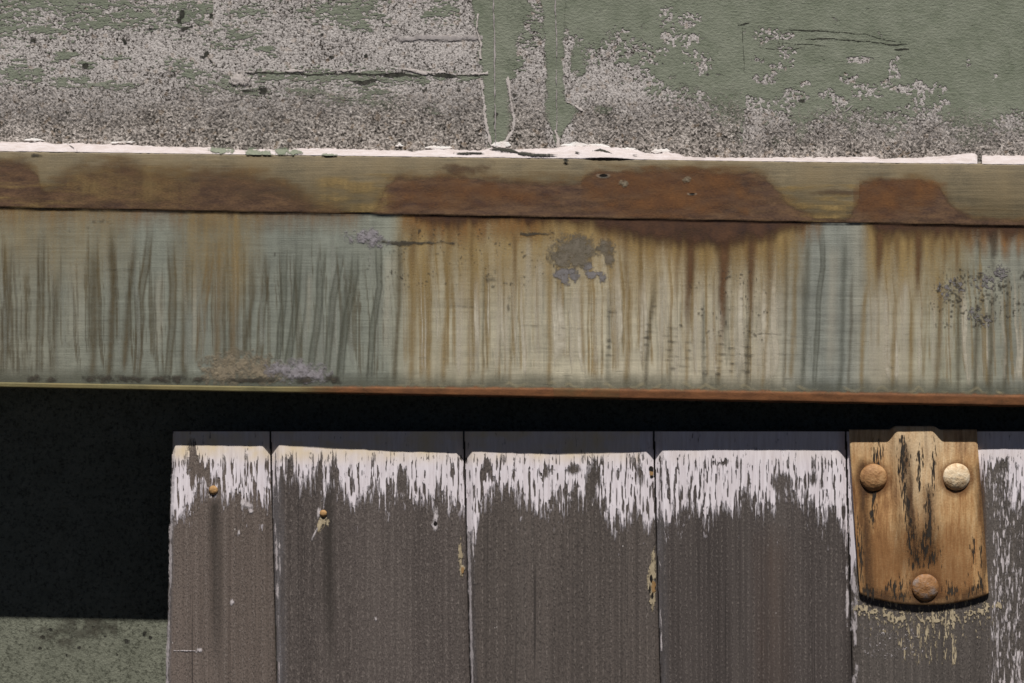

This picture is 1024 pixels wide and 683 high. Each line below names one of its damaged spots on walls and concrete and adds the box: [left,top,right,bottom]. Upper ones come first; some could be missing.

peeling [0,0,1024,164]
peeling [348,228,454,248]
leakage [0,214,959,394]
peeling [520,232,614,285]
corrosion [374,165,1024,315]
leakage [958,293,1024,395]
peeling [171,432,857,610]
peeling [977,432,1024,512]